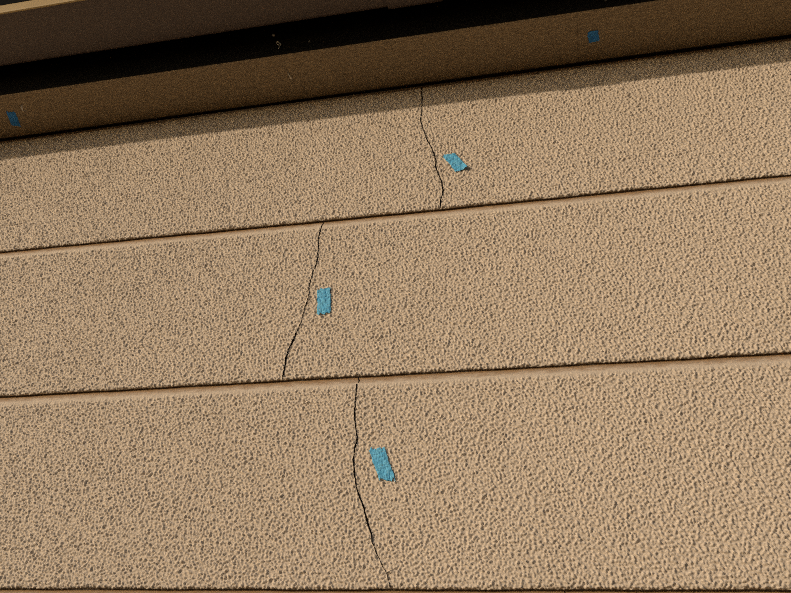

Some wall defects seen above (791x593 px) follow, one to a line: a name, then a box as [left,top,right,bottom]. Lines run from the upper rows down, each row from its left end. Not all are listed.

crack [420,87,444,207]
crack [282,223,324,379]
crack [352,377,395,588]